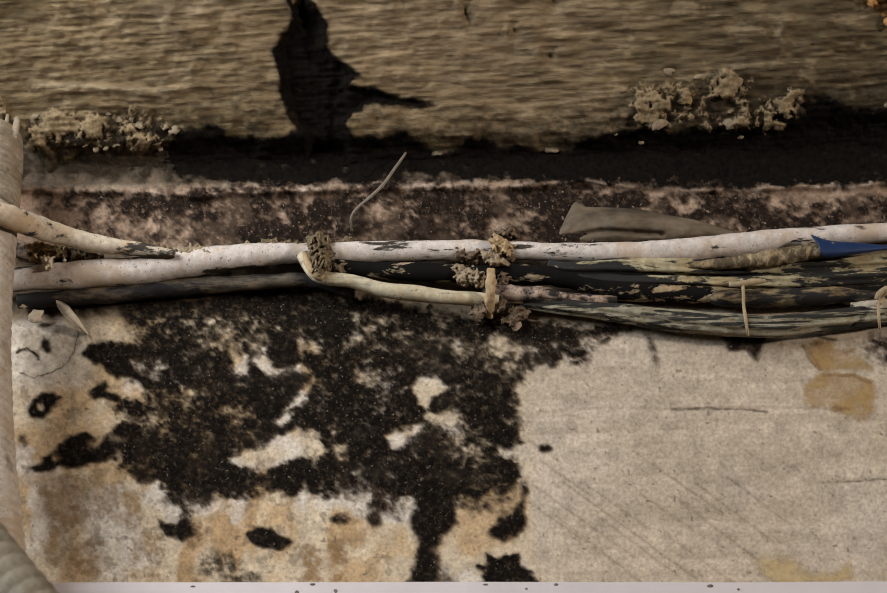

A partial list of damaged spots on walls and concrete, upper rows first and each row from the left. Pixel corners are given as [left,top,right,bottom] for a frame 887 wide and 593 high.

crack [271,0,433,166]
spalling [629,68,806,139]
leakage [28,287,635,582]